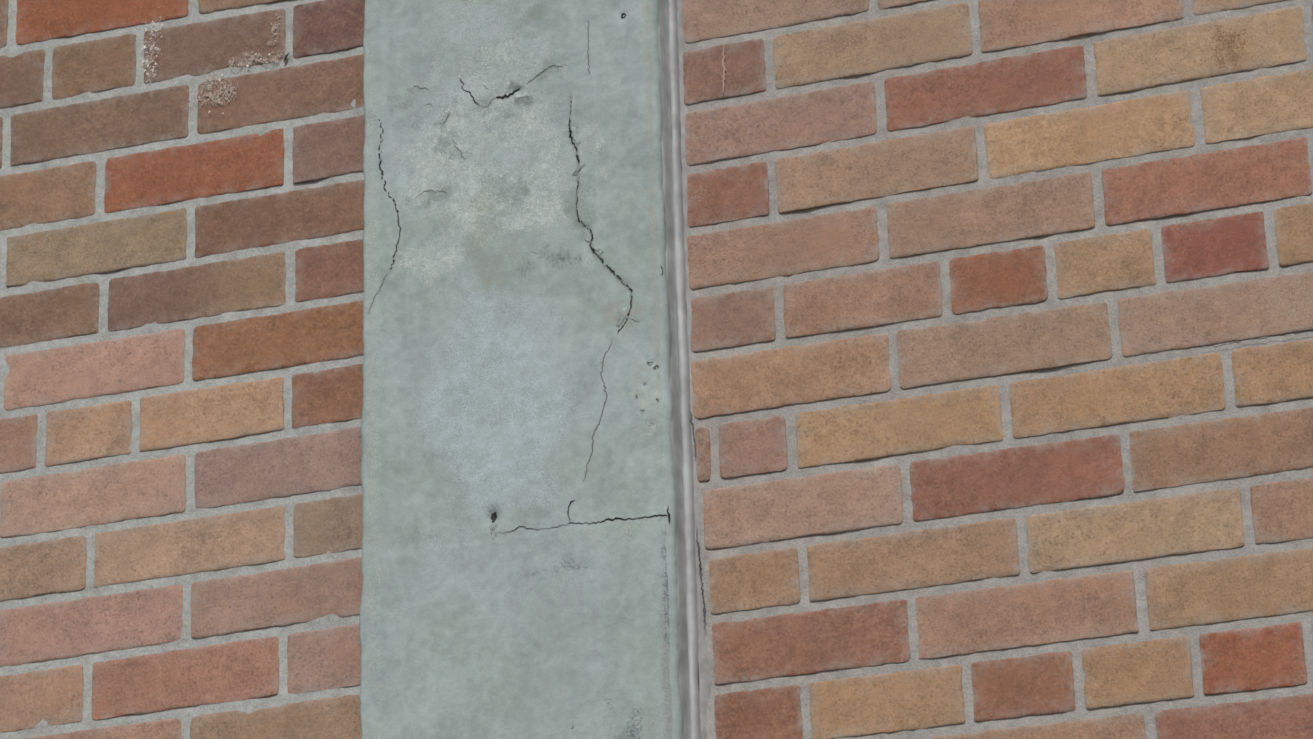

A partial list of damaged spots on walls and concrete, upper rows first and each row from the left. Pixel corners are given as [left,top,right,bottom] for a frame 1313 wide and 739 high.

crack [369,116,401,312]
crack [497,101,706,630]